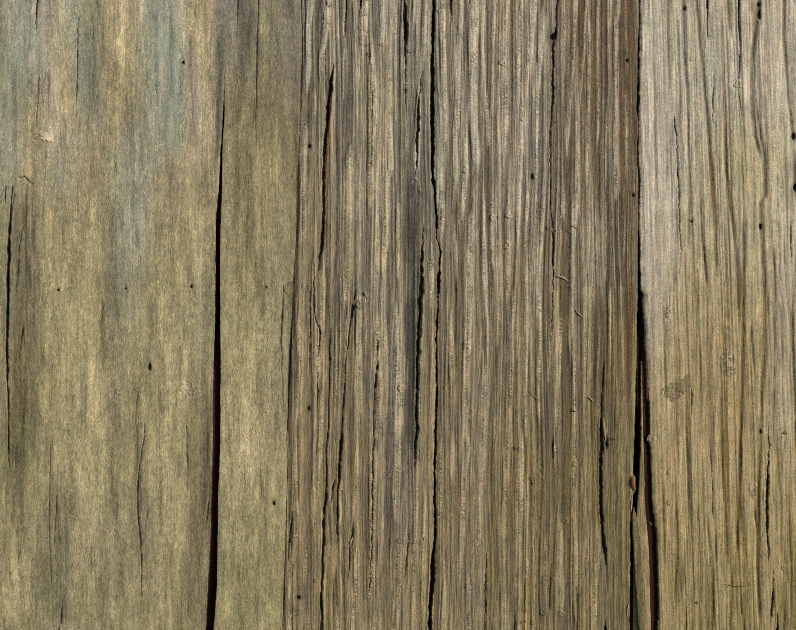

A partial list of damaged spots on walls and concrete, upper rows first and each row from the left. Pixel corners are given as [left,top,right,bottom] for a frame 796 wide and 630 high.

crack [5,176,31,464]
crack [309,65,378,630]
crack [545,0,558,323]
crack [754,429,785,630]